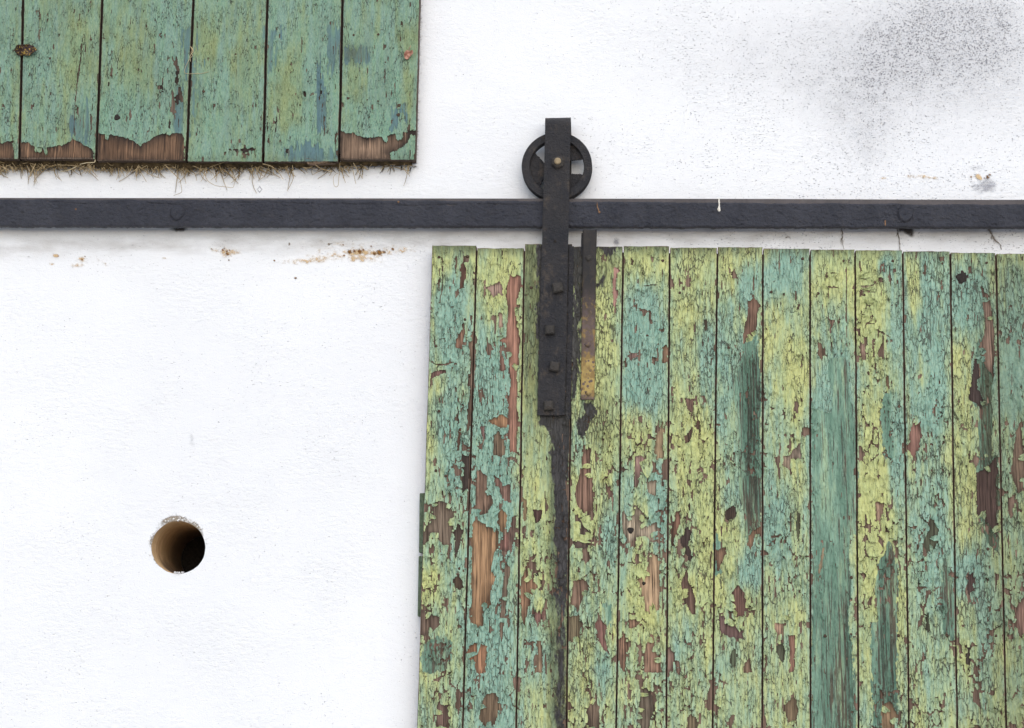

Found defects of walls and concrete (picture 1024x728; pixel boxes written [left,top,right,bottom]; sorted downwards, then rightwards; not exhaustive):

water stain [782,0,1024,152]
corrosion [332,244,405,261]